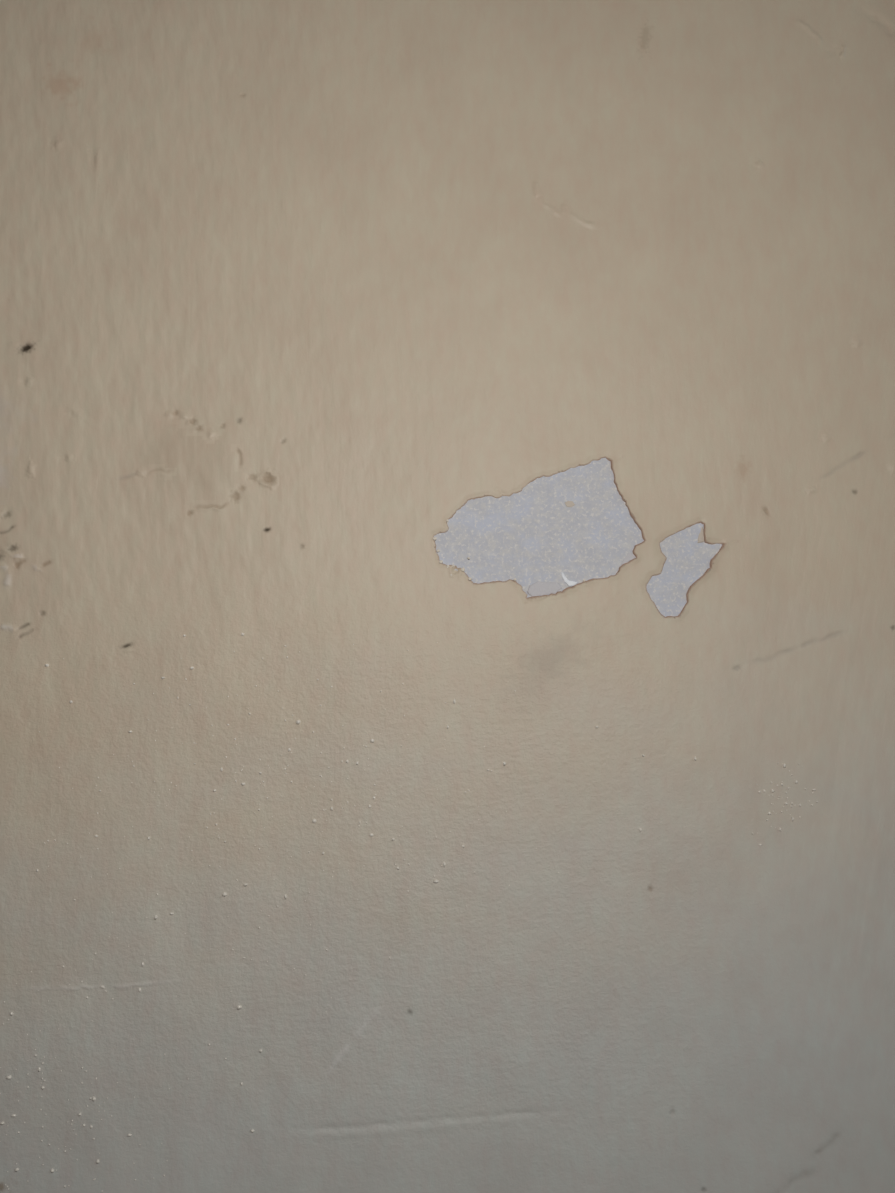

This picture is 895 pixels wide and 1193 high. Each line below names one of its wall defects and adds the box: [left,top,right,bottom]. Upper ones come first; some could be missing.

peeling [423,446,742,626]